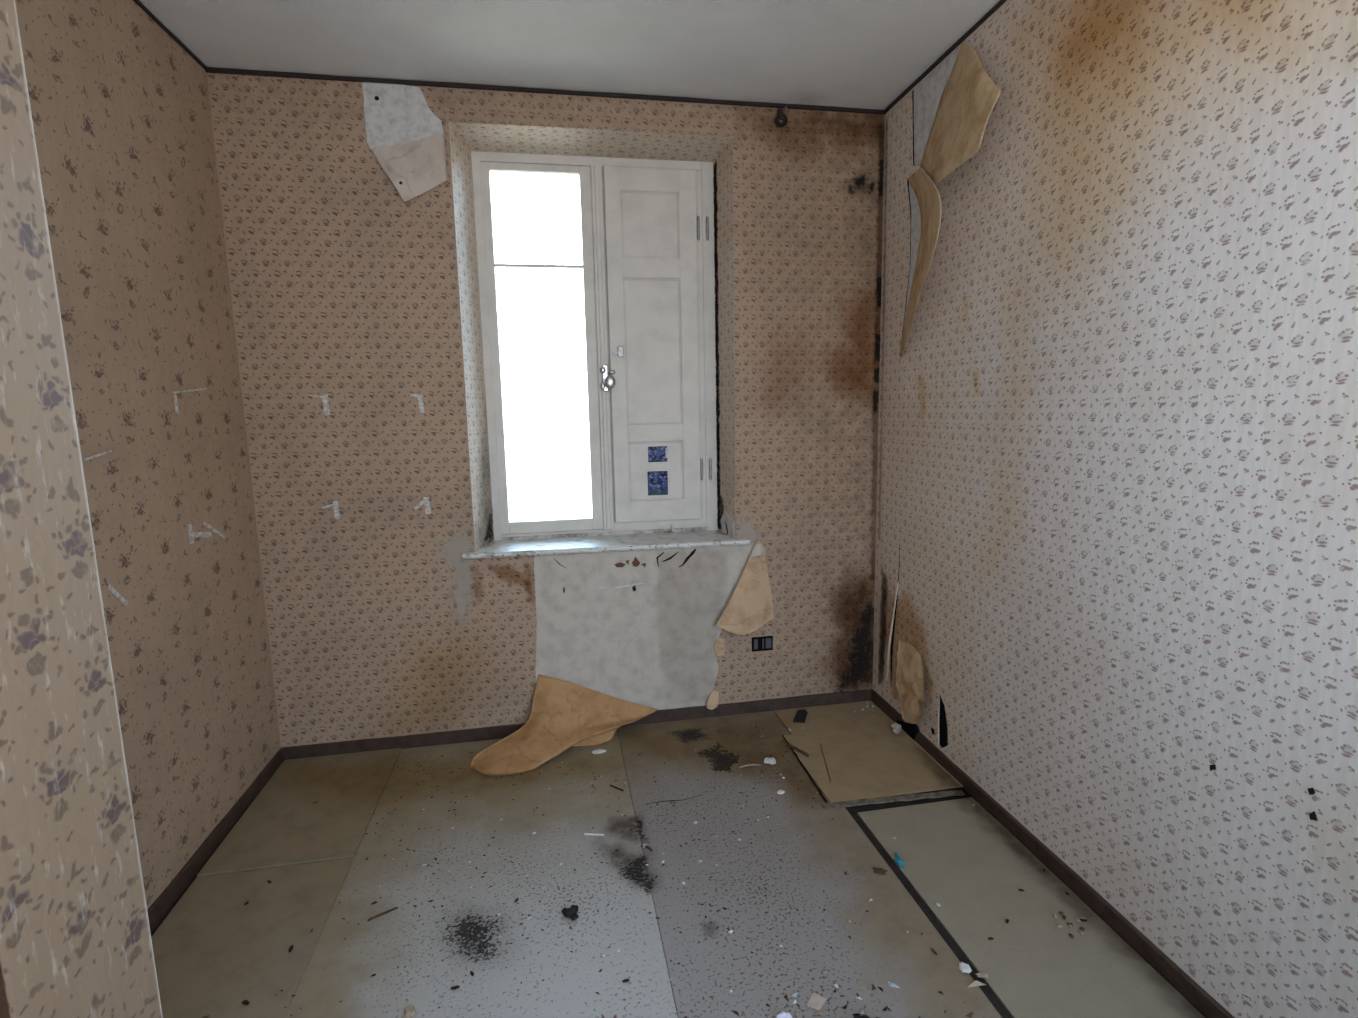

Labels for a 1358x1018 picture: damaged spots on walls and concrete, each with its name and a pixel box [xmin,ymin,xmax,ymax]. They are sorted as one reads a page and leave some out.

flaking render [362,82,443,151]
damp [849,160,884,196]
peeling [899,46,960,357]
flaking render [534,510,766,710]
damp [834,574,887,693]